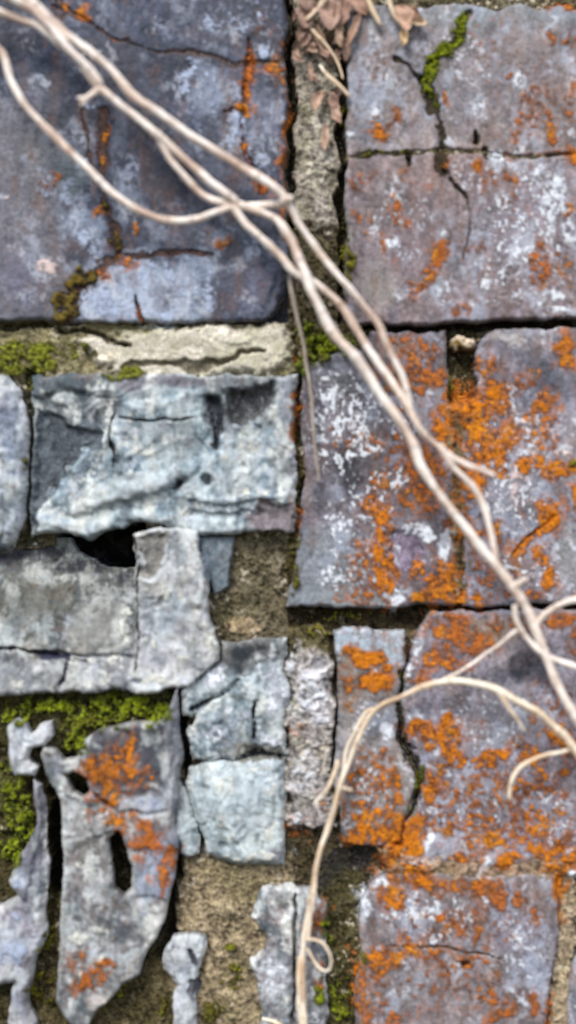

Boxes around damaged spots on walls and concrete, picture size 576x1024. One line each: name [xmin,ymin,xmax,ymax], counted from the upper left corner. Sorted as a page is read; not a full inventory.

crack [54,106,214,326]
crack [53,0,284,196]
crack [393,56,471,260]
crack [473,130,488,160]
peeling [0,374,109,553]
spalling [201,377,276,450]
spalling [243,497,301,534]
peeling [0,527,235,1024]
crack [395,670,421,801]